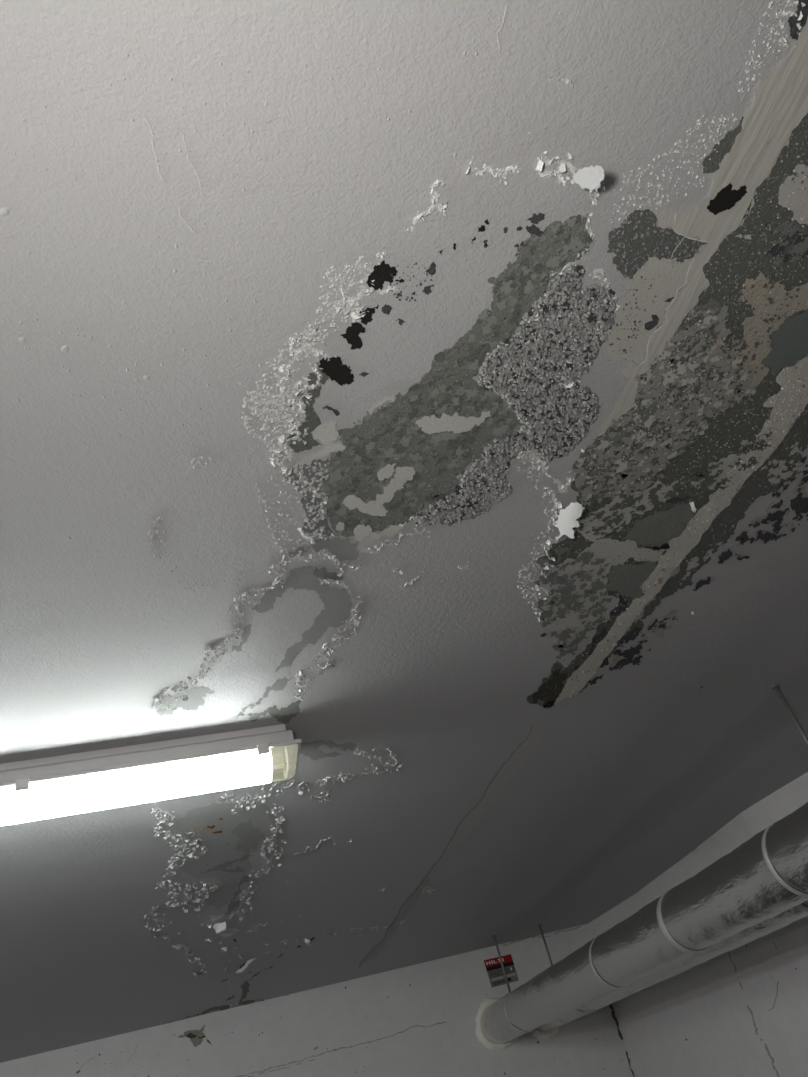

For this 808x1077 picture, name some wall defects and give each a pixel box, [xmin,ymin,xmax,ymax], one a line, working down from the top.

spalling [748,0,808,80]
damp [284,214,808,563]
damp [534,547,658,659]
peeling [150,674,215,716]
damp [531,673,567,708]
peeling [142,740,405,1047]
crack [235,1021,446,1077]
crack [609,1004,635,1077]
crack [728,951,780,1077]